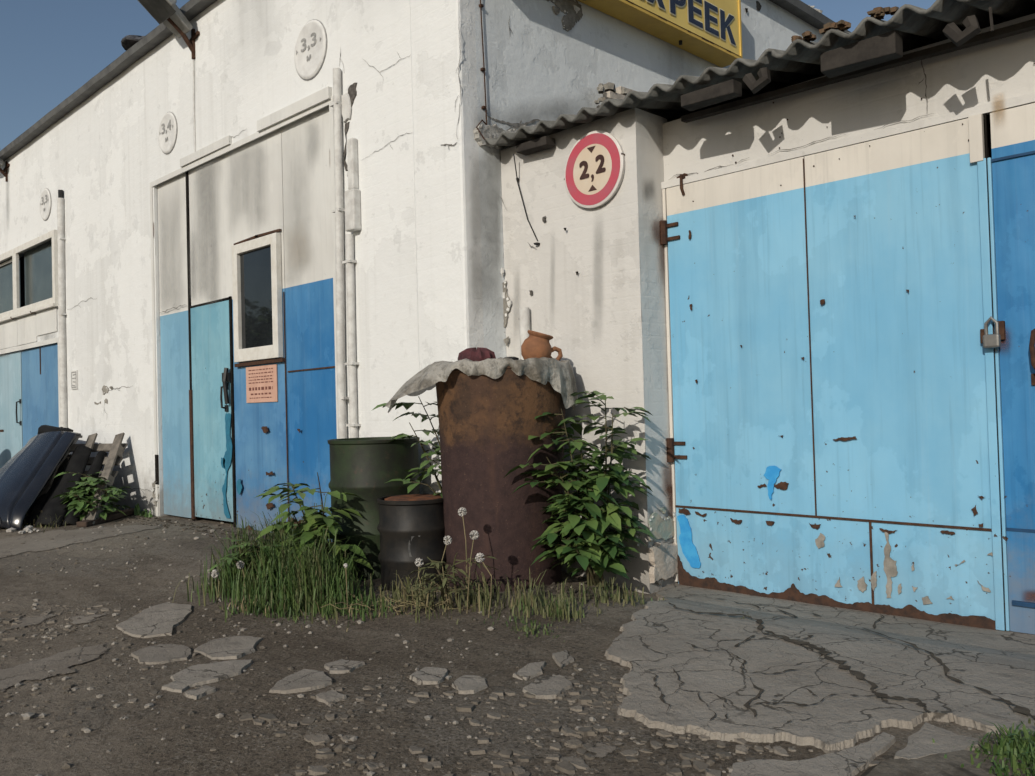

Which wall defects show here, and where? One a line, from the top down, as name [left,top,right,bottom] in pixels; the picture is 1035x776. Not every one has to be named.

peeling [547,0,583,32]
flaking render [341,83,357,176]
corrosion [758,482,789,490]
flaking render [606,507,701,585]
corrosion [809,523,825,549]
corrosion [677,528,1002,631]